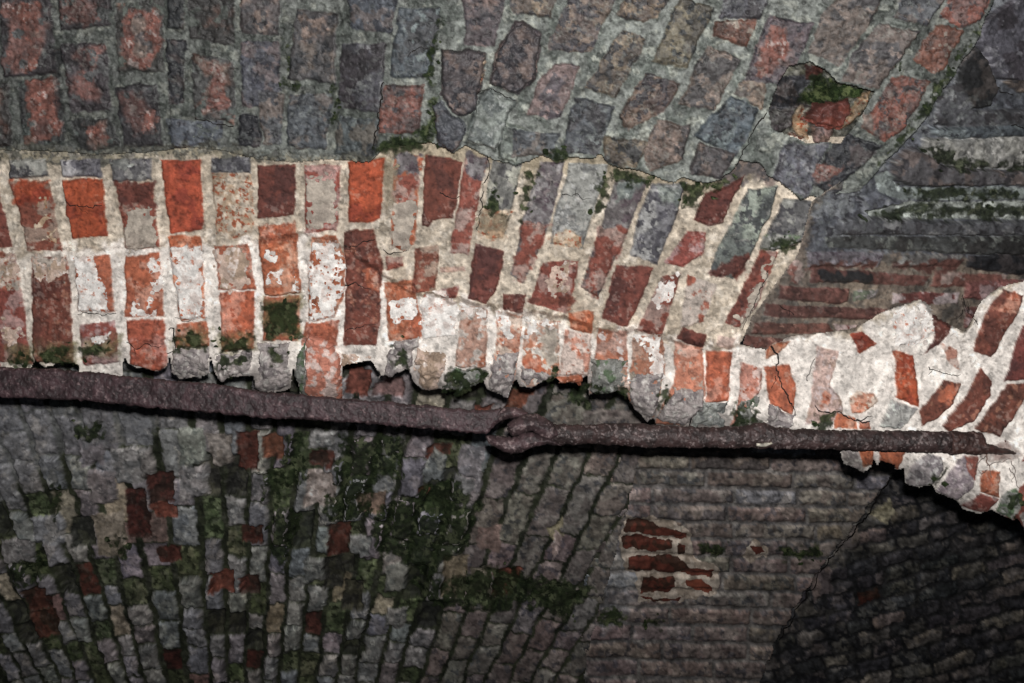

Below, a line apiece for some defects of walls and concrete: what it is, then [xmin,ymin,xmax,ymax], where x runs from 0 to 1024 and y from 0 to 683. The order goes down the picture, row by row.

spalling [769,61,874,143]
spalling [341,353,371,366]
peeling [379,289,795,428]
peeling [733,256,776,327]
peeling [891,301,935,346]
crack [779,475,893,640]